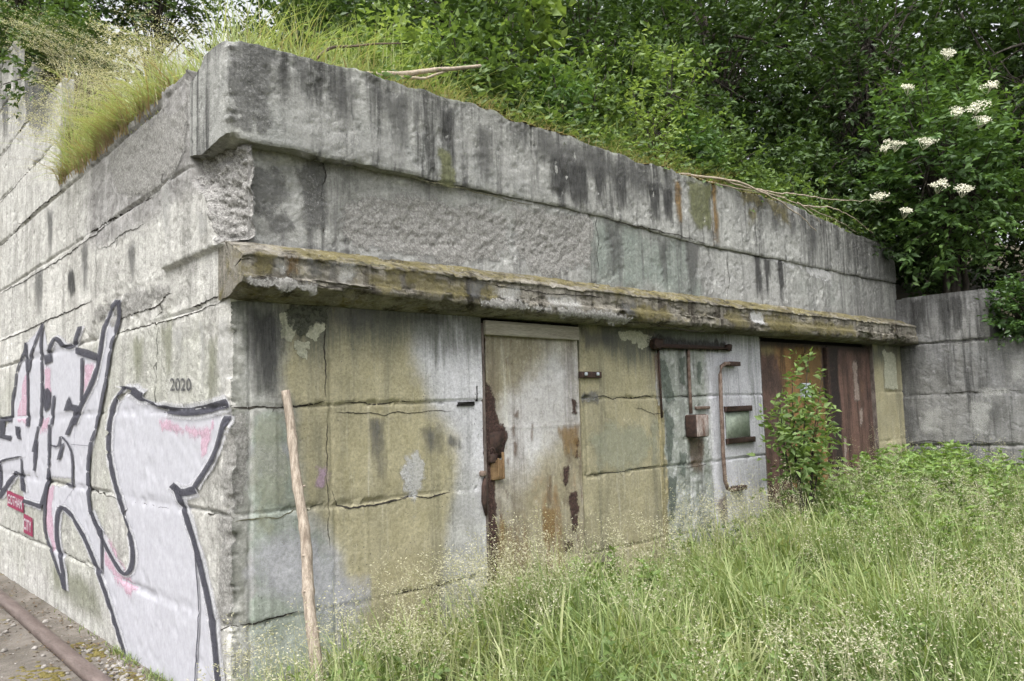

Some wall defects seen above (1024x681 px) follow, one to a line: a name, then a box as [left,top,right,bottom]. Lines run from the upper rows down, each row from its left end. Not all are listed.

crack [1,190,152,341]
damp [248,310,279,392]
peeling [246,276,328,360]
crack [208,322,450,542]
spalling [196,144,595,278]
rust [482,383,508,585]
spalling [480,298,653,350]
rust [560,427,579,553]
damp [541,135,672,221]
crack [598,395,706,416]
rust [790,347,826,458]
rust [852,361,863,424]